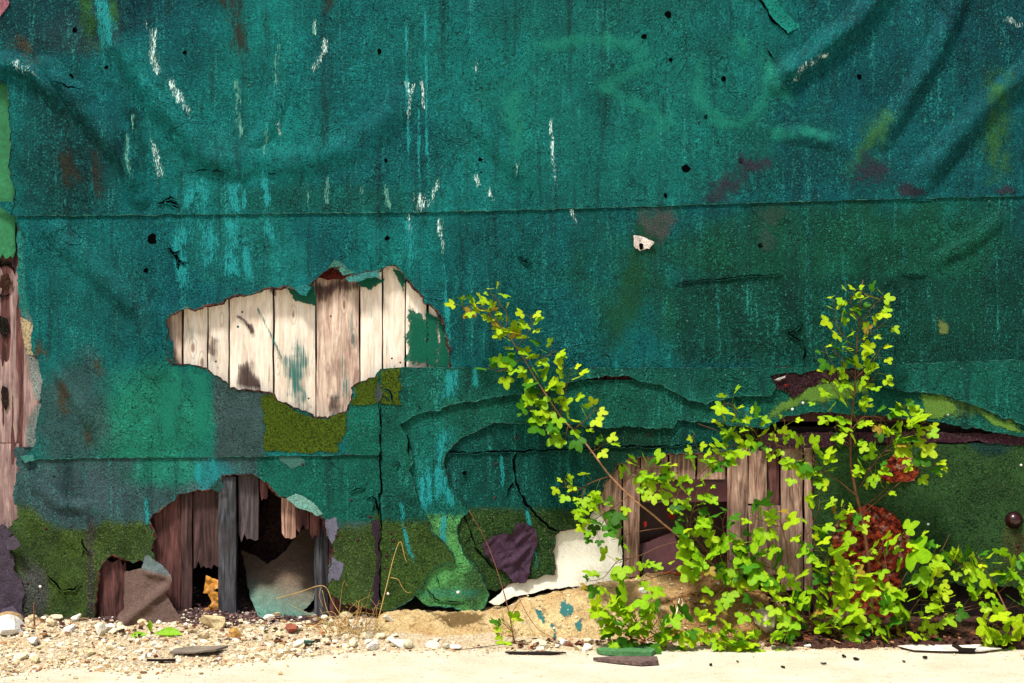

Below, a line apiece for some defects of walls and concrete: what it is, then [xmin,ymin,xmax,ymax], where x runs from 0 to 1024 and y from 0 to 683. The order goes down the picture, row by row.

damp [110,96,145,175]
peeling [294,259,406,296]
peeling [633,235,654,251]
peeling [260,307,449,469]
peeling [287,493,338,543]
crack [350,387,410,603]
peeling [394,422,527,611]
crack [447,441,728,534]
peeling [328,556,344,583]